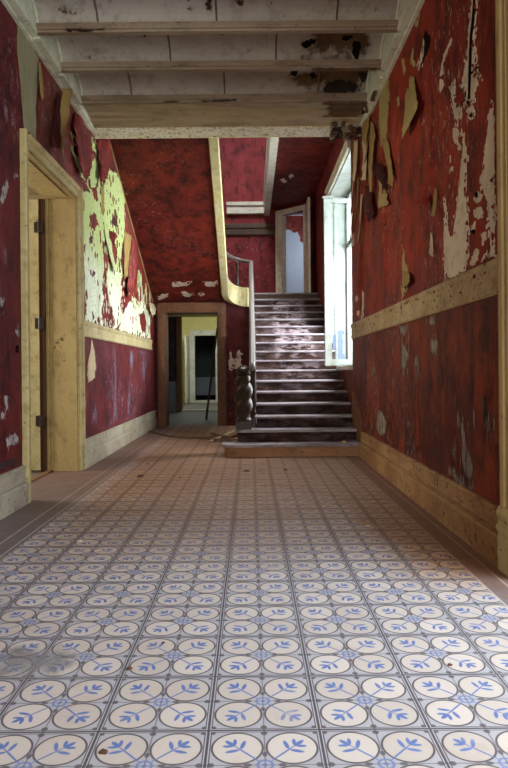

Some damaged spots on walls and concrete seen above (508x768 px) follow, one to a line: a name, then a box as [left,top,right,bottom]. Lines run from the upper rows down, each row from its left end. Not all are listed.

damp [289,33,377,89]
flaking render [402,38,424,74]
flaking render [362,76,400,147]
flaking render [439,38,497,297]
flaking render [70,131,218,339]
flaking render [228,350,243,371]